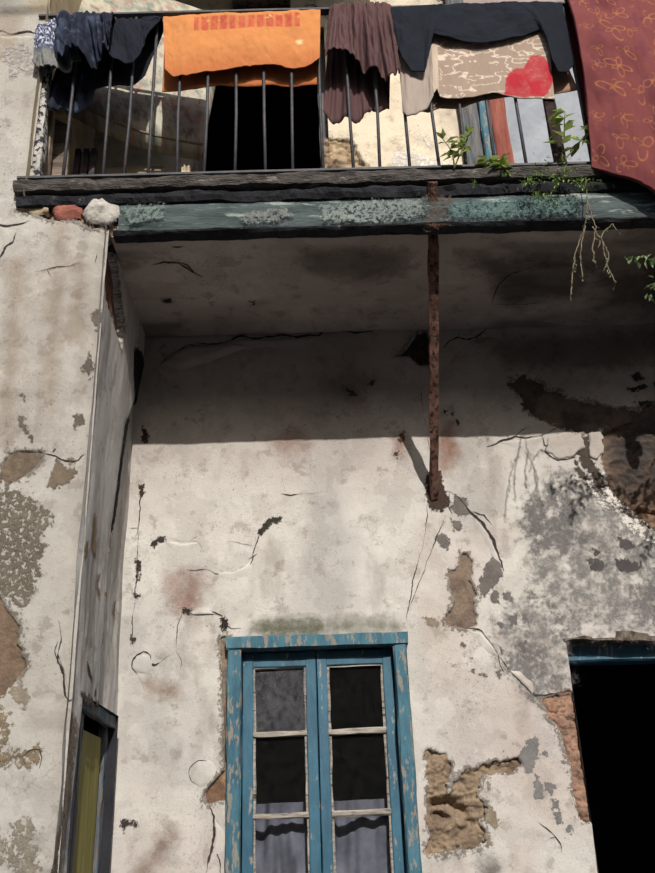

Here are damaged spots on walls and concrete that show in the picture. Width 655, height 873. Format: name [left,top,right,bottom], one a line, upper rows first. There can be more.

crack [0,220,29,257]
peeling [0,415,55,771]
peeling [46,457,78,489]
peeling [72,413,85,430]
crack [130,489,236,688]
crack [164,519,277,579]
crack [200,332,324,351]
crack [406,489,504,619]
spalling [421,470,513,679]
leakage [499,472,655,698]
spalling [504,372,655,573]
spalling [421,687,590,862]